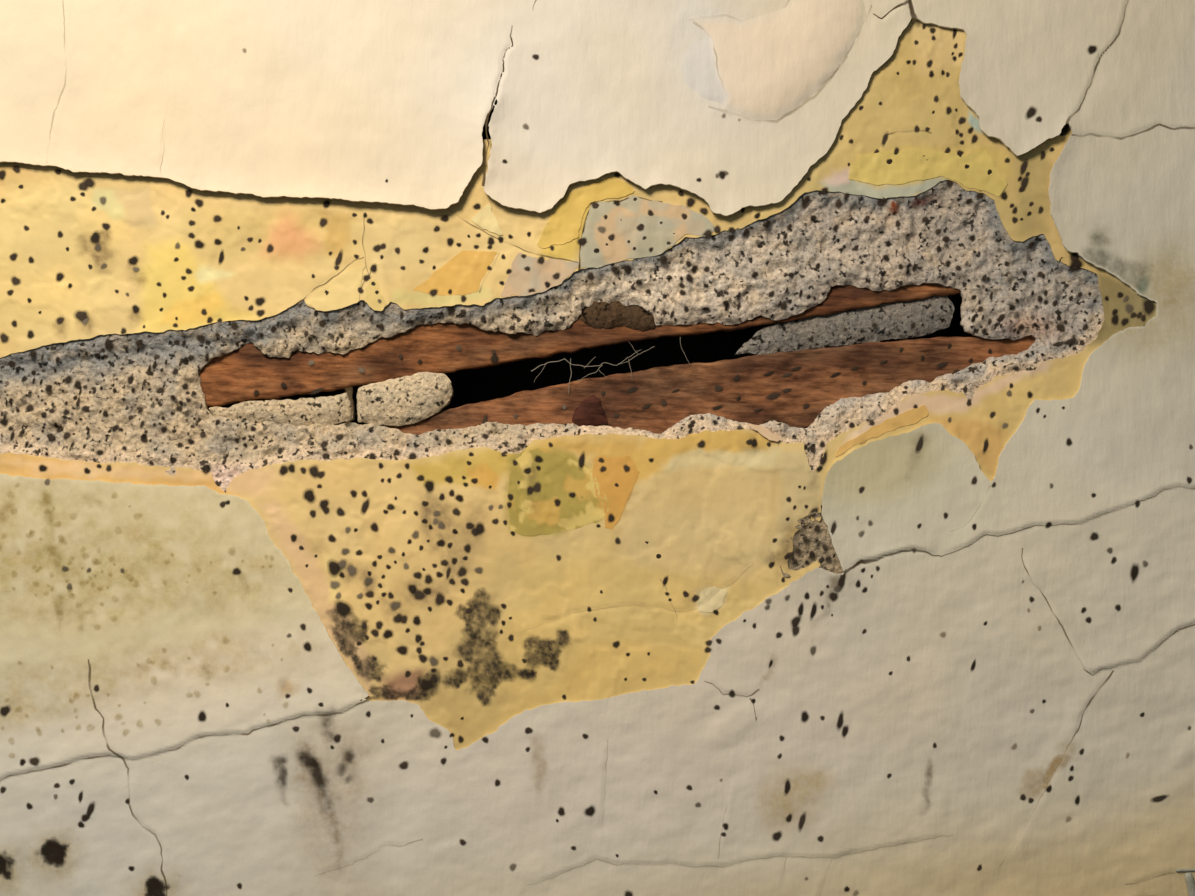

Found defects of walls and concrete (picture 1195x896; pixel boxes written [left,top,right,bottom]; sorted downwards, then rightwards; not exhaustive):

crack [873,0,917,22]
crack [482,28,513,186]
crack [1066,18,1124,135]
leakage [174,189,224,291]
leakage [347,244,405,329]
leakage [434,215,554,285]
leakage [578,198,816,321]
leakage [0,282,351,502]
flaking render [0,19,1156,750]
leakage [278,428,569,717]
crack [843,524,1072,641]
crack [50,659,129,770]